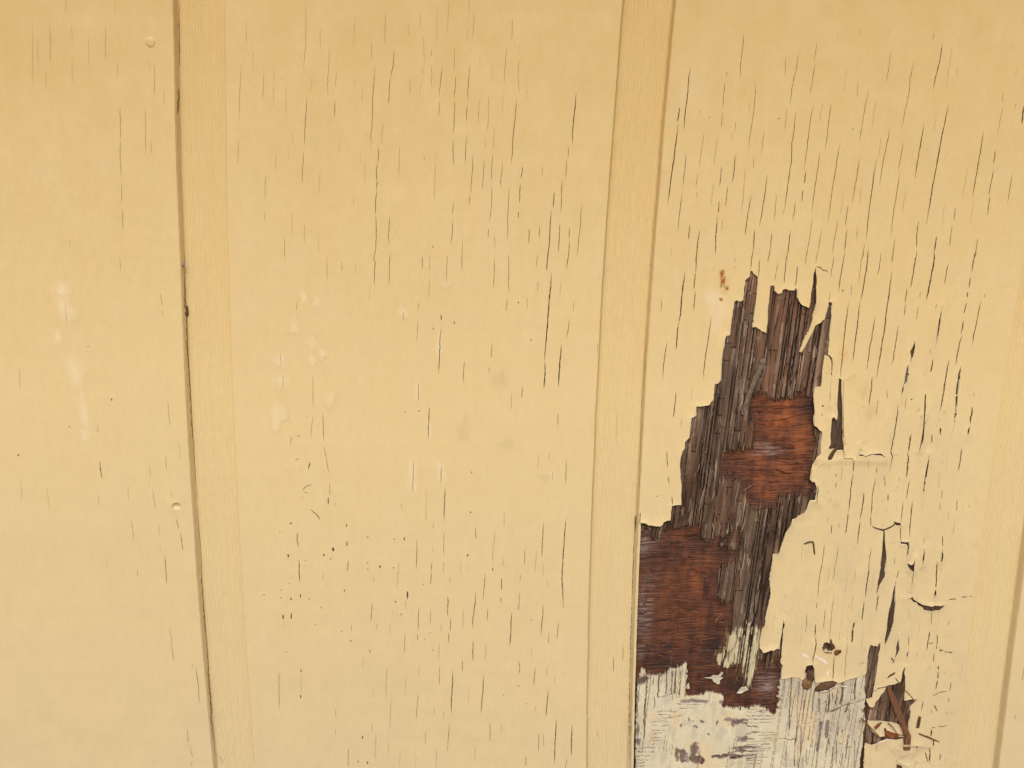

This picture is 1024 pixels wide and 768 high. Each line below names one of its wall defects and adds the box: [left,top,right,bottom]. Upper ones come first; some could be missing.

crack [290,419,336,519]
crack [239,3,582,435]
crack [373,463,572,768]
rust [717,265,731,302]
peeling [628,269,917,768]
crack [638,32,1024,762]